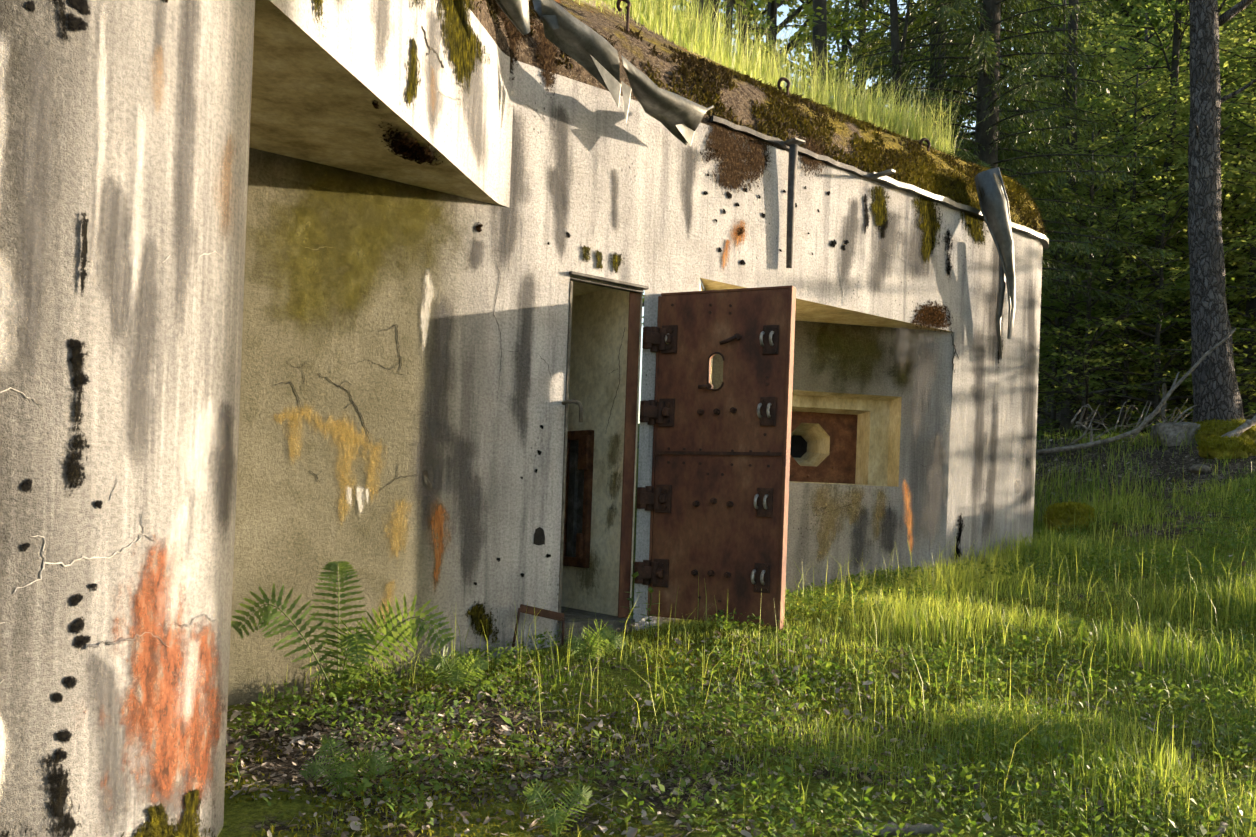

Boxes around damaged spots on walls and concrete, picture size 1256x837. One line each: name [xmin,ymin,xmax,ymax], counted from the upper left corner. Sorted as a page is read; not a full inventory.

leakage [23,54,55,363]
corrosion [722,221,747,269]
crack [273,324,403,442]
crack [14,513,159,593]
corrosion [428,503,451,587]
corrosion [812,483,885,558]
corrosion [902,480,914,552]
crack [84,614,220,649]
corrosion [113,535,226,812]